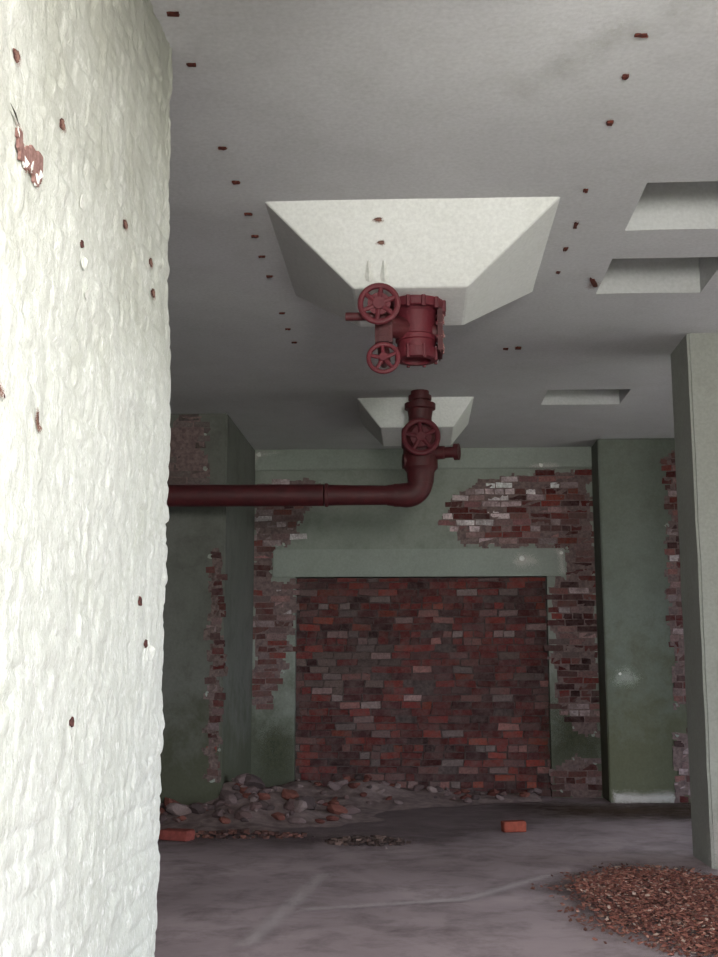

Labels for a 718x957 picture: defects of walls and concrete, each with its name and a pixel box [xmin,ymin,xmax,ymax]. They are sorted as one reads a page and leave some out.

flaking render [10,103,44,190]
flaking render [201,548,228,783]
flaking render [252,506,312,710]
flaking render [438,462,644,738]
flaking render [659,450,686,710]
flaking render [672,728,691,803]
peeling [706,813,718,869]